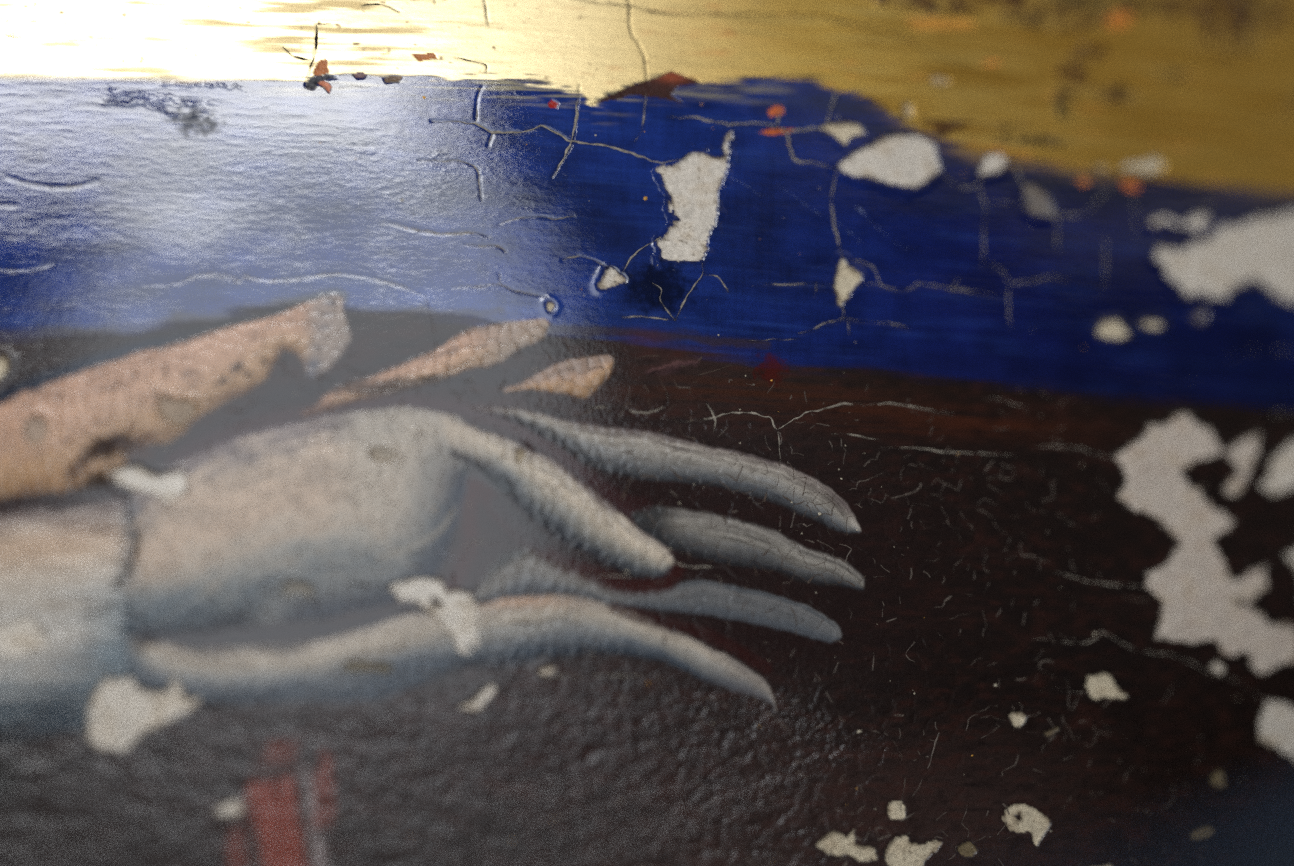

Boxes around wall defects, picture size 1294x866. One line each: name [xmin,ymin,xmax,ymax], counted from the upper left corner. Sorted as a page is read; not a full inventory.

peeling [656,132,732,263]
crack [397,0,995,341]
peeling [820,123,940,189]
peeling [835,260,862,306]
peeling [1149,212,1294,323]
crack [587,396,1113,459]
peeling [1116,414,1294,675]
peeling [389,578,480,655]
peeling [88,676,202,752]
peeling [1258,700,1294,760]
peeling [817,830,977,866]
peeling [1002,805,1050,847]